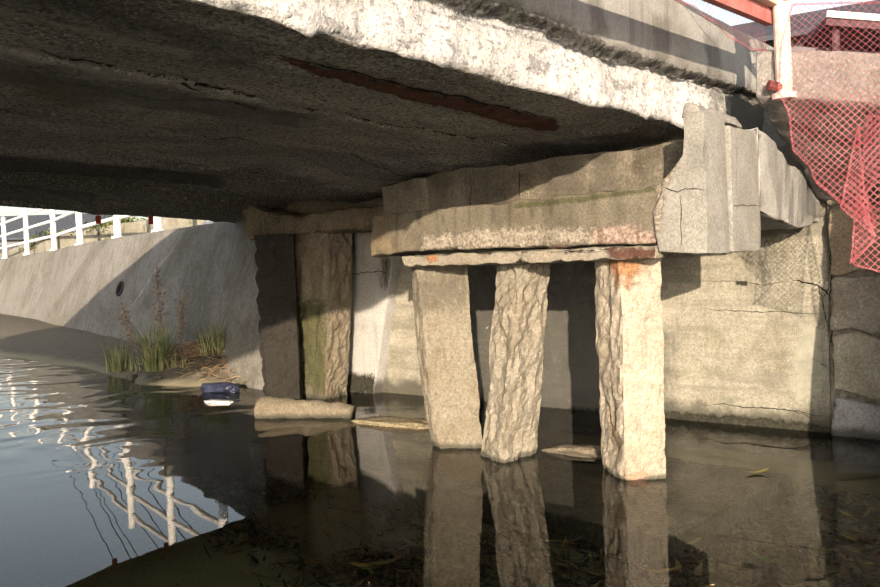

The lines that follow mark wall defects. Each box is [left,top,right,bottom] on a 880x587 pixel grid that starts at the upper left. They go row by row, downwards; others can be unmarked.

crack [12,45,507,144]
rust [258,50,560,131]
spalling [526,54,551,73]
crack [666,188,698,244]
rust [607,246,656,289]
crack [703,232,833,343]